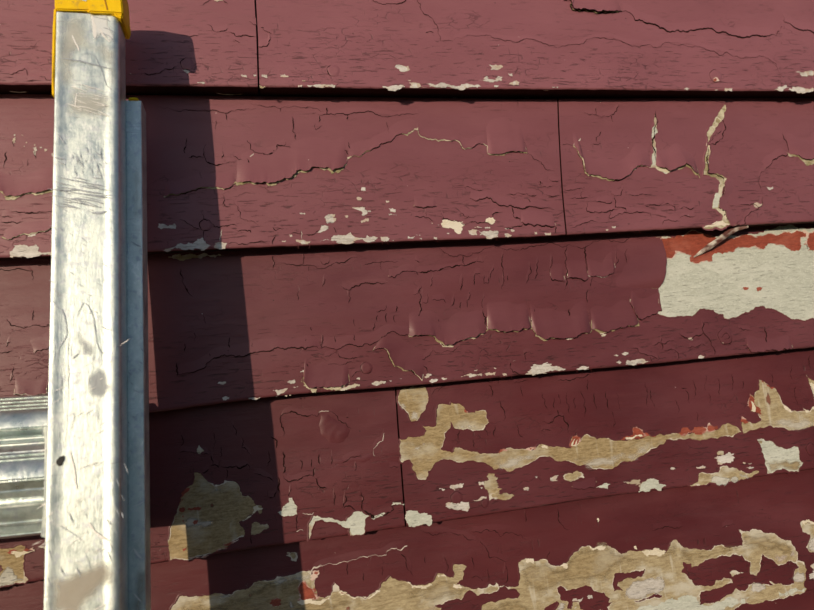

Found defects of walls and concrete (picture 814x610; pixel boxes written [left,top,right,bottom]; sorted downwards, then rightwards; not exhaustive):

crack [373,0,452,41]
crack [709,120,726,145]
peeling [2,217,52,258]
spalling [316,187,394,244]
spalling [432,217,514,239]
peeling [322,225,814,350]
spalling [526,362,565,375]
peeling [396,373,814,512]
peeling [167,471,270,562]
spalling [307,510,385,542]
spalling [392,502,432,527]
peeling [169,519,814,610]